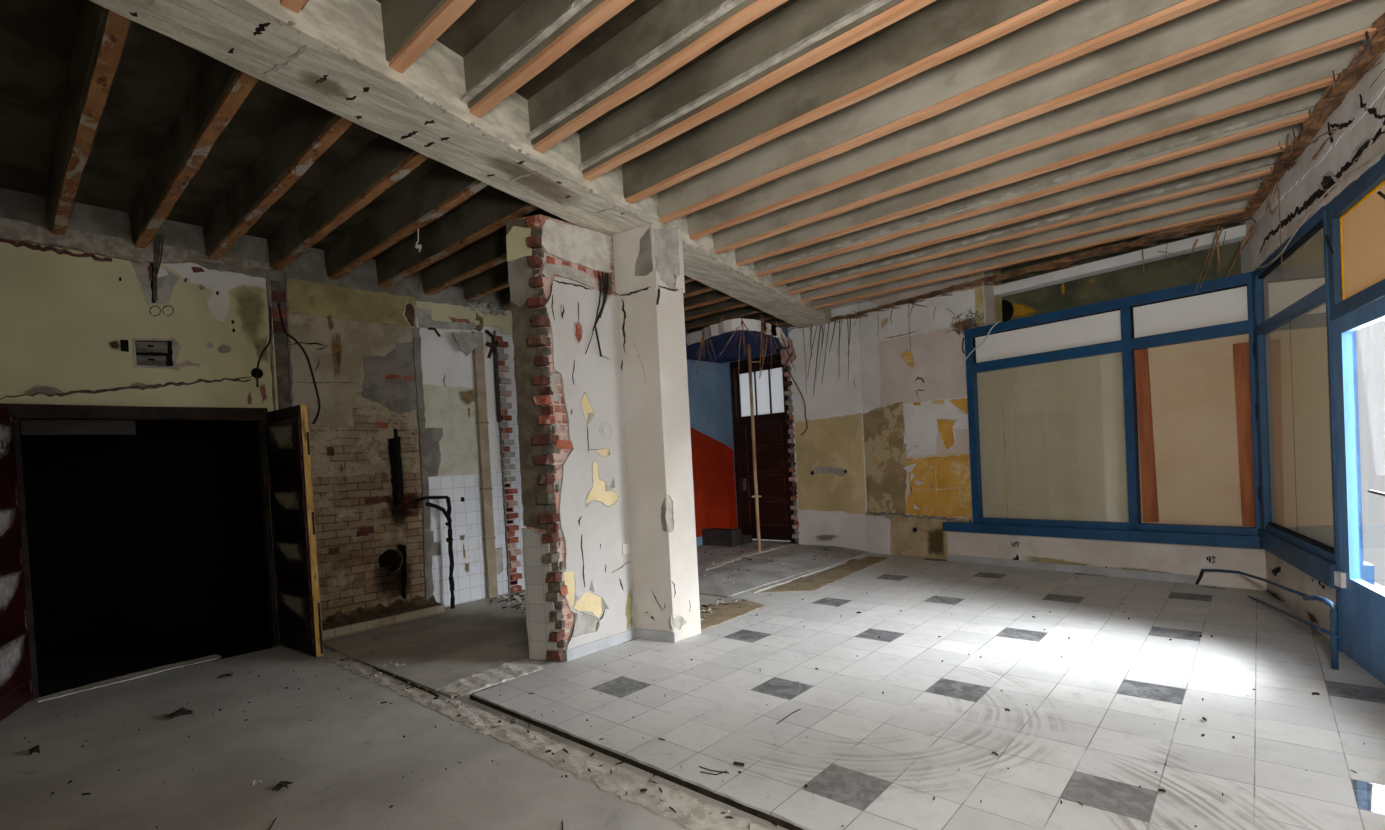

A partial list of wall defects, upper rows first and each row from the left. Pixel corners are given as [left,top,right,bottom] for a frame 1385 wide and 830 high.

spalling [1349,96,1385,162]
peeling [130,261,266,323]
spalling [573,320,583,345]
crack [0,375,253,400]
peeling [386,374,480,477]
peeling [580,392,594,427]
spalling [493,330,522,593]
peeling [584,448,619,508]
peeling [903,397,968,533]
peeling [431,530,442,557]
peeling [562,569,609,637]